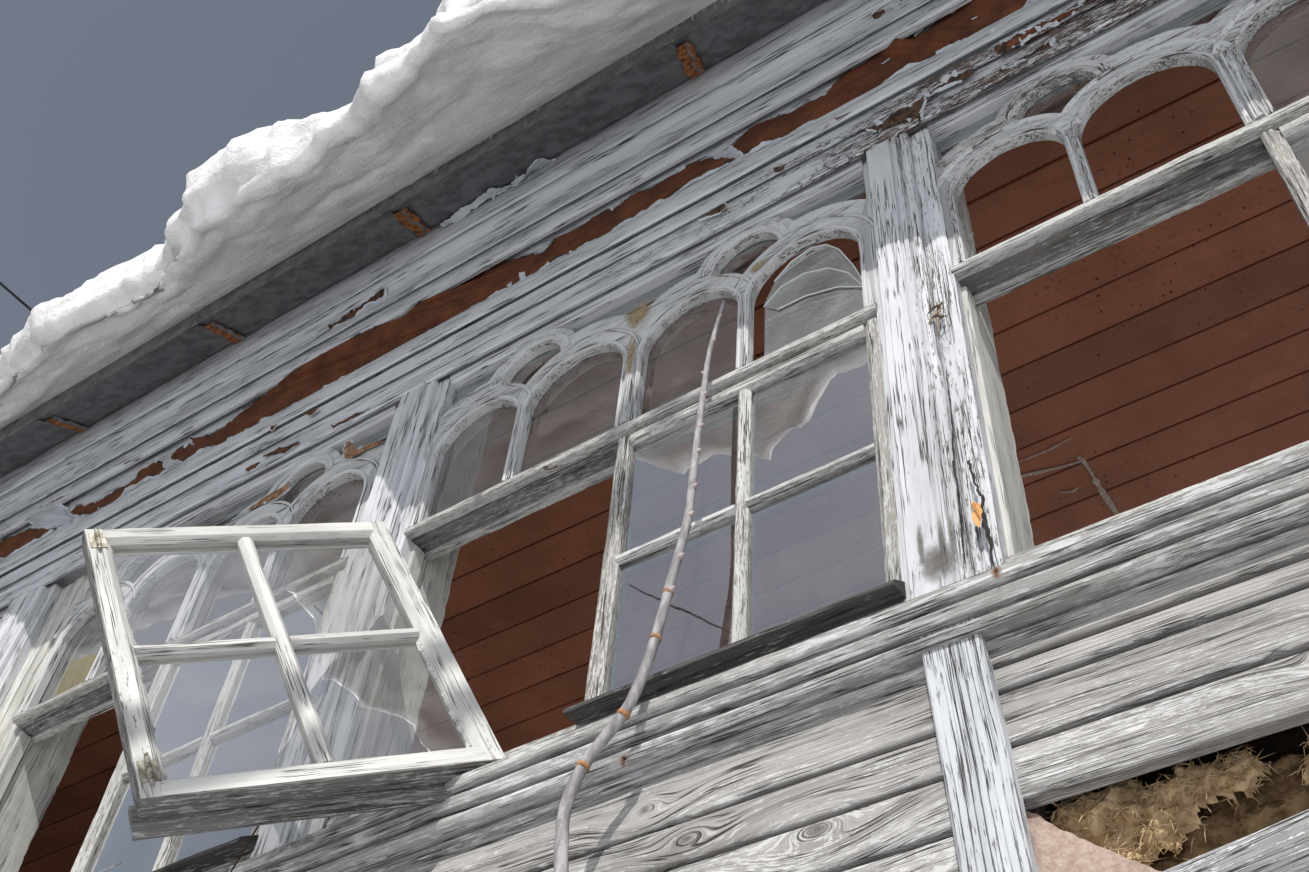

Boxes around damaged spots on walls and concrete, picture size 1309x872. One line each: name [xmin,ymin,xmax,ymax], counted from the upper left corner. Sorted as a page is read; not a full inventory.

corrosion [676,41,705,81]
corrosion [393,208,431,238]
peeling [0,0,1091,561]
corrosion [204,321,245,343]
crack [946,370,994,565]